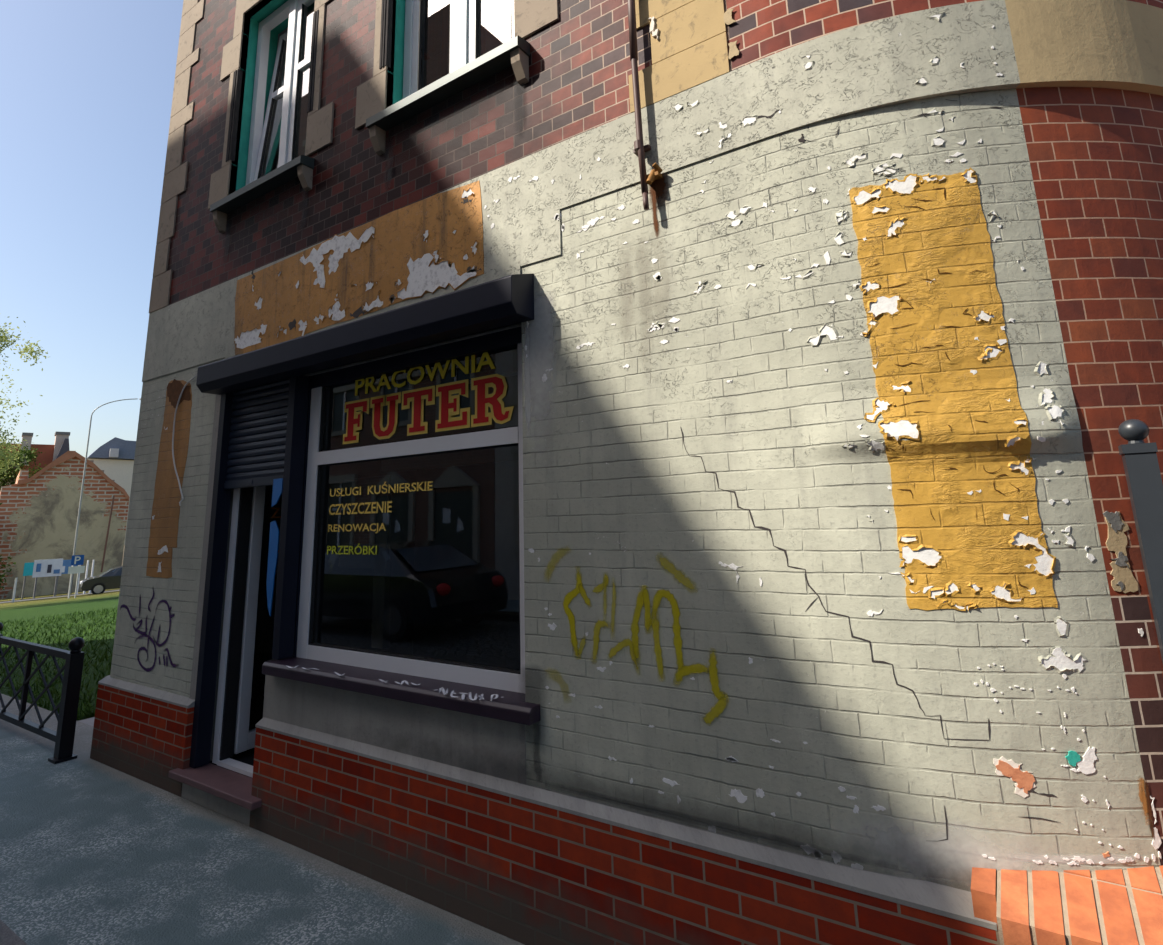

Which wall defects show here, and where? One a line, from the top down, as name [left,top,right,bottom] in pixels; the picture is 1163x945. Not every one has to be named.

corrosion [649,175,668,235]
peeling [780,108,982,280]
crack [904,187,946,210]
peeling [234,225,481,350]
peeling [827,280,903,337]
crack [868,263,979,367]
peeling [970,309,1014,375]
peeling [843,381,921,454]
peeling [1031,361,1065,425]
crack [944,465,1019,496]
crack [681,429,990,740]
peeling [878,513,1095,619]